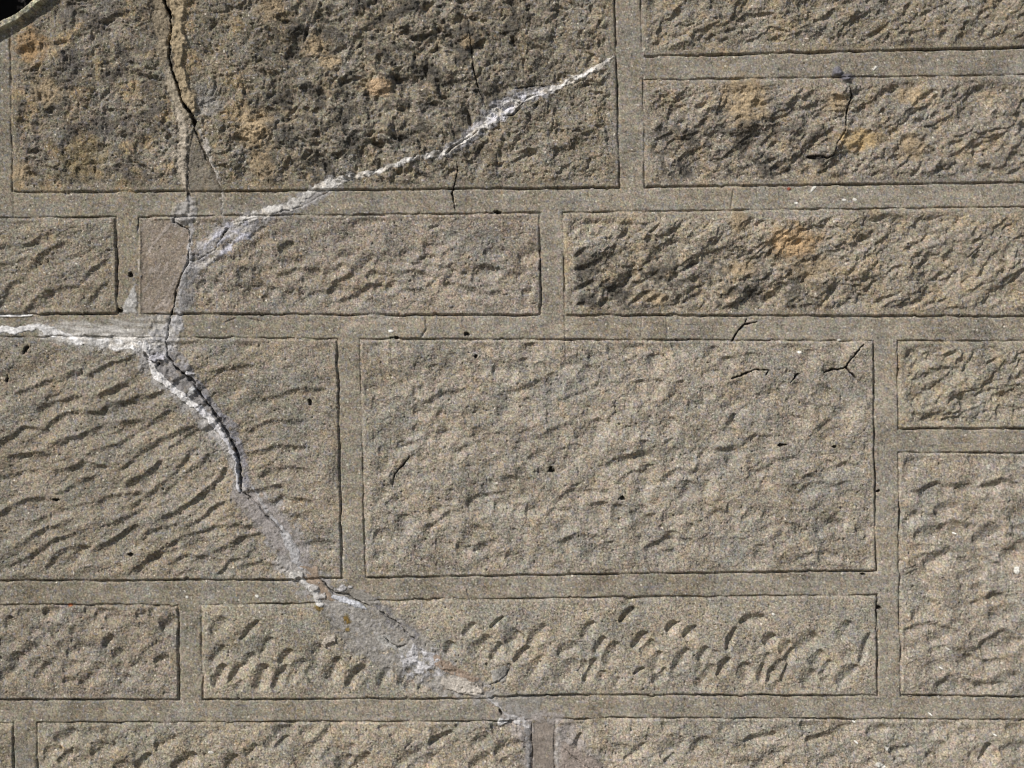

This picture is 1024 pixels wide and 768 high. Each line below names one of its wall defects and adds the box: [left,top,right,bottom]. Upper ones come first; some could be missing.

water stain [370,78,390,96]
water stain [235,108,272,172]
crack [806,88,852,160]
water stain [143,222,187,310]
crack [0,0,615,768]
crack [824,346,862,377]
spalling [321,588,509,698]